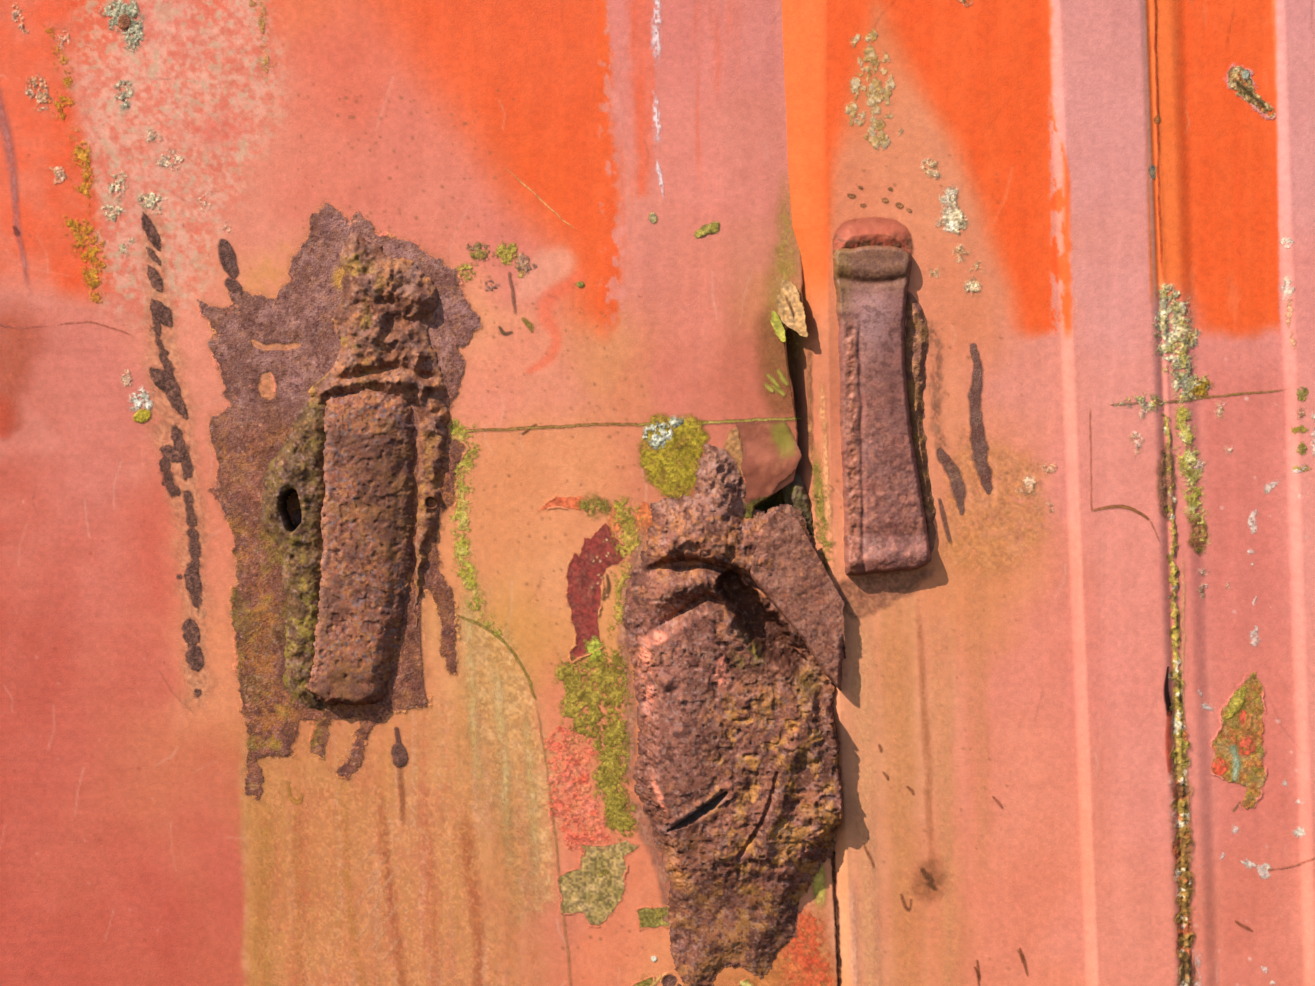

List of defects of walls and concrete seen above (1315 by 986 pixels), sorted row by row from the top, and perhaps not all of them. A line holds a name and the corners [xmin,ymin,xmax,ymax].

corrosion [929,327,965,543]
corrosion [968,343,992,494]
corrosion [197,203,482,812]
peeling [539,496,583,510]
peeling [566,502,652,663]
corrosion [836,569,932,618]
peeling [1248,510,1257,533]
peeling [1199,672,1267,811]
peeling [557,840,638,928]
corrosion [628,799,669,923]
peeling [637,906,671,931]
peeling [1241,859,1270,879]